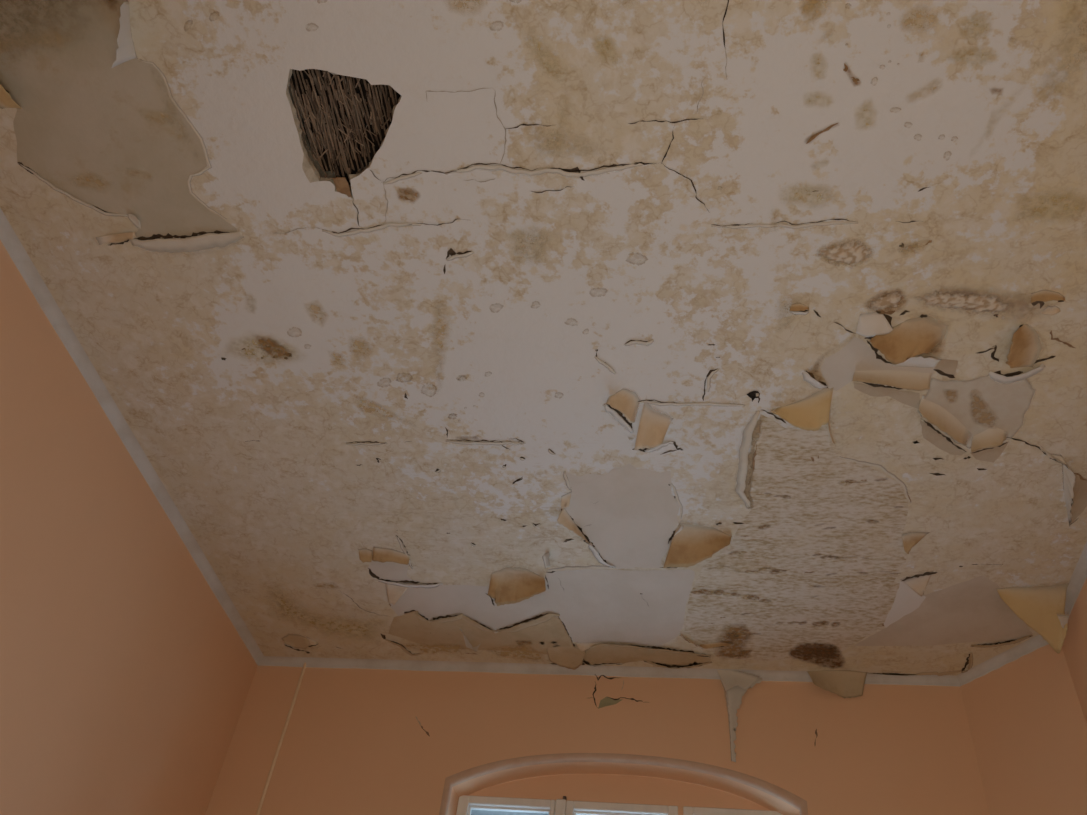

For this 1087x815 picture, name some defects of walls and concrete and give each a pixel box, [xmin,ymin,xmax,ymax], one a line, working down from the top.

peeling [0,0,244,252]
flaking render [286,69,402,199]
crack [276,0,858,237]
peeling [789,303,821,317]
peeling [820,313,942,391]
peeling [368,411,911,670]
damp [790,643,843,668]
peeling [807,634,1033,698]